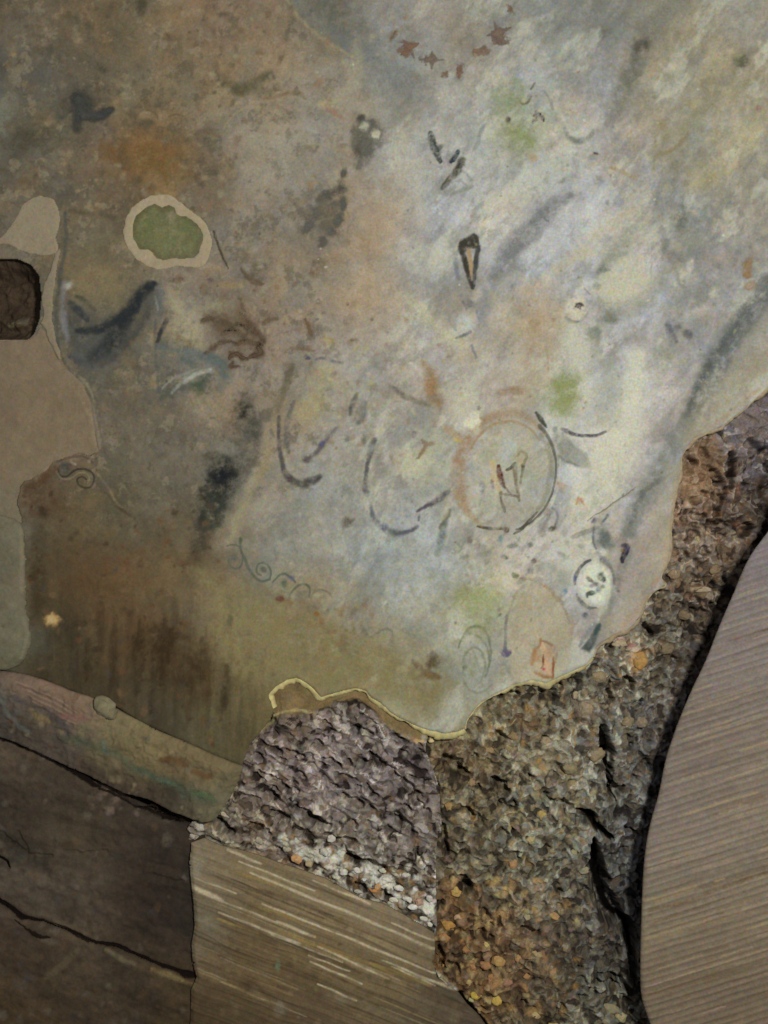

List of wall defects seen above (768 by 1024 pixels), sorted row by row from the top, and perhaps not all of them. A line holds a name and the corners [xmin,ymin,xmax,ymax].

leakage [134,204,203,259]
spalling [187,388,768,1024]
crack [0,737,185,821]
crack [599,724,617,801]
crack [580,808,632,955]
crack [0,898,196,978]